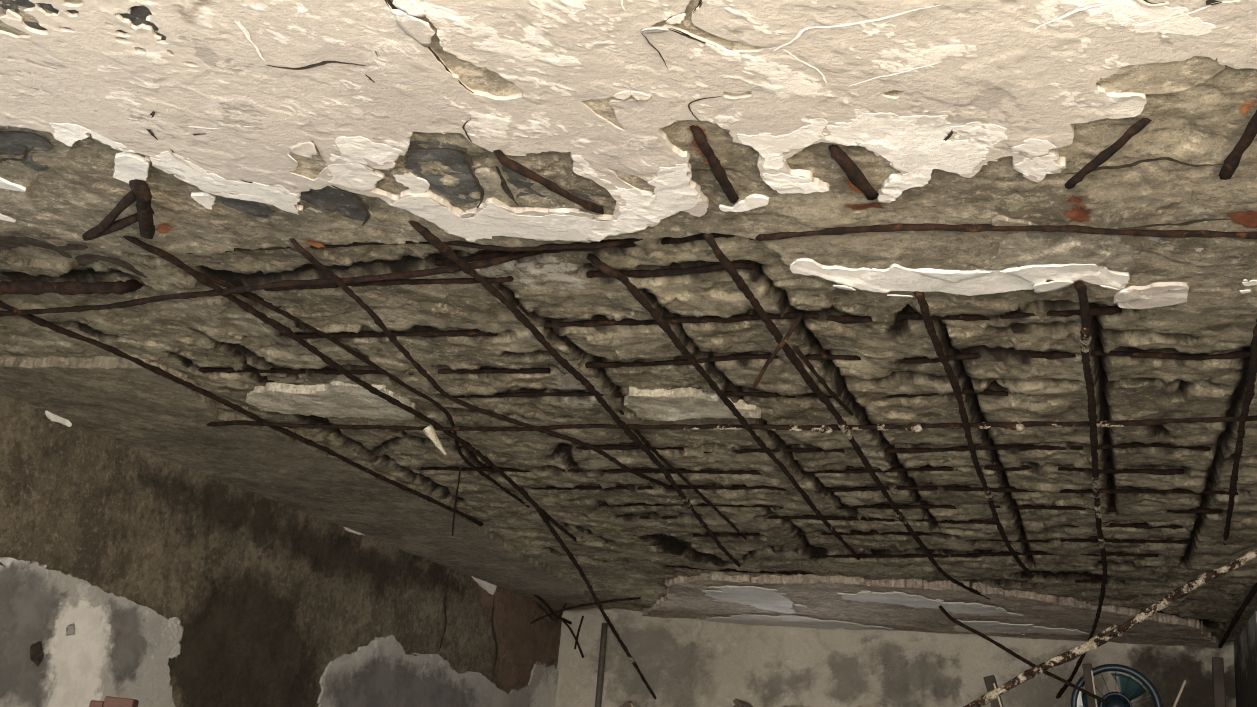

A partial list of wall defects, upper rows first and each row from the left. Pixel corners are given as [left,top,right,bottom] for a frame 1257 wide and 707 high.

spalling [0,0,84,36]
spalling [117,5,172,52]
flaking render [385,0,523,96]
corrosion [493,149,604,215]
corrosion [688,125,739,204]
corrosion [749,118,1257,241]
corrosion [1219,101,1257,180]
spalling [0,65,1257,612]
corrosion [0,179,1257,699]
damp [0,562,146,707]
flaking render [0,395,563,707]
damp [138,468,561,707]